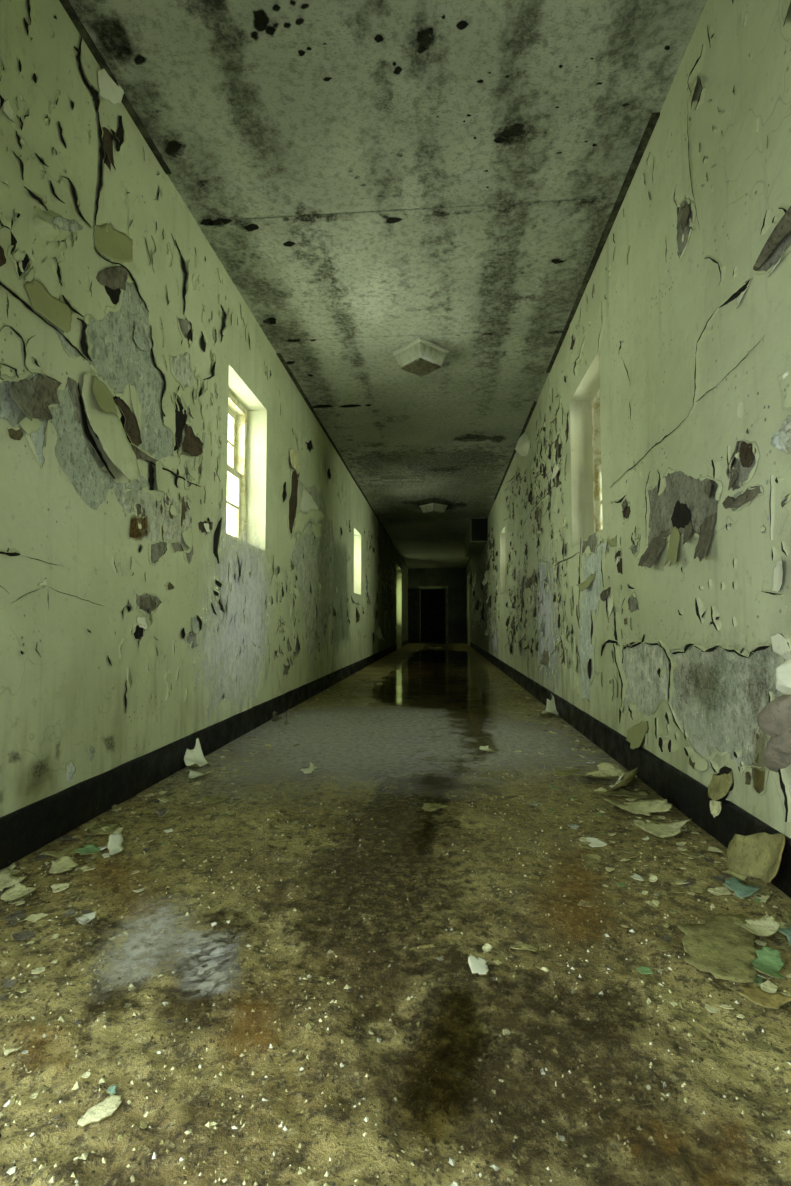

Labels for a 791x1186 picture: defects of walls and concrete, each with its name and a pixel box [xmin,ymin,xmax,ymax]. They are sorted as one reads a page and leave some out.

peeling [97,68,130,171]
water stain [76,0,371,408]
water stain [376,21,440,109]
crack [707,25,715,48]
peeling [0,213,230,566]
crack [0,0,346,712]
crack [523,86,761,724]
crack [721,403,769,534]
peeling [127,581,174,641]
spalling [482,301,791,1010]
peeling [0,676,373,926]
peeling [468,955,489,975]